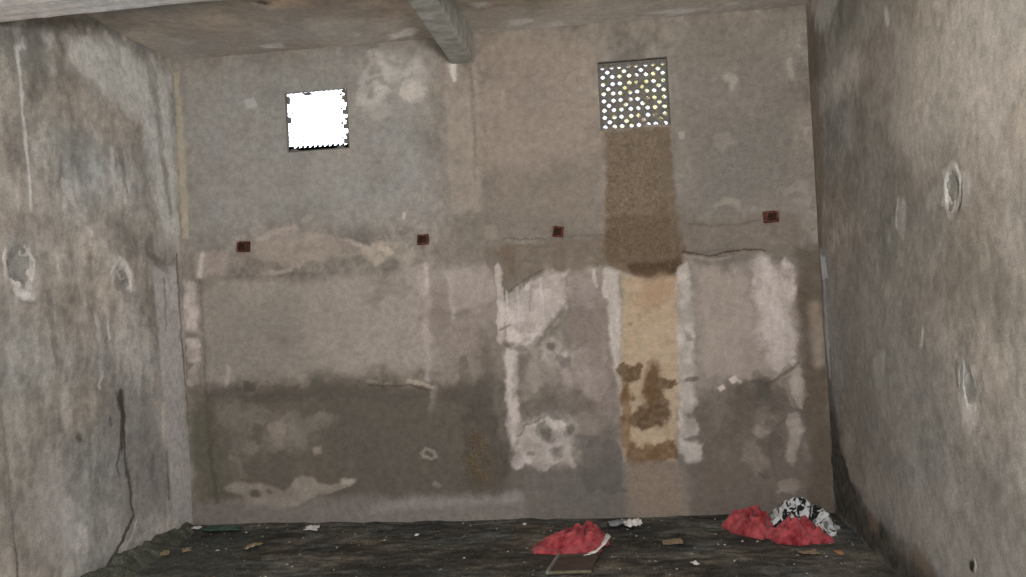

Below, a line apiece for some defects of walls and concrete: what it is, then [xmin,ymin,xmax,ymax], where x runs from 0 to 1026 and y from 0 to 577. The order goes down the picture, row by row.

spalling [0,240,45,304]
crack [74,430,84,447]
crack [107,384,138,558]
leakage [0,0,626,508]
peeling [688,259,771,393]
leakage [673,248,811,498]
leakage [807,0,957,577]
spalling [939,156,974,225]